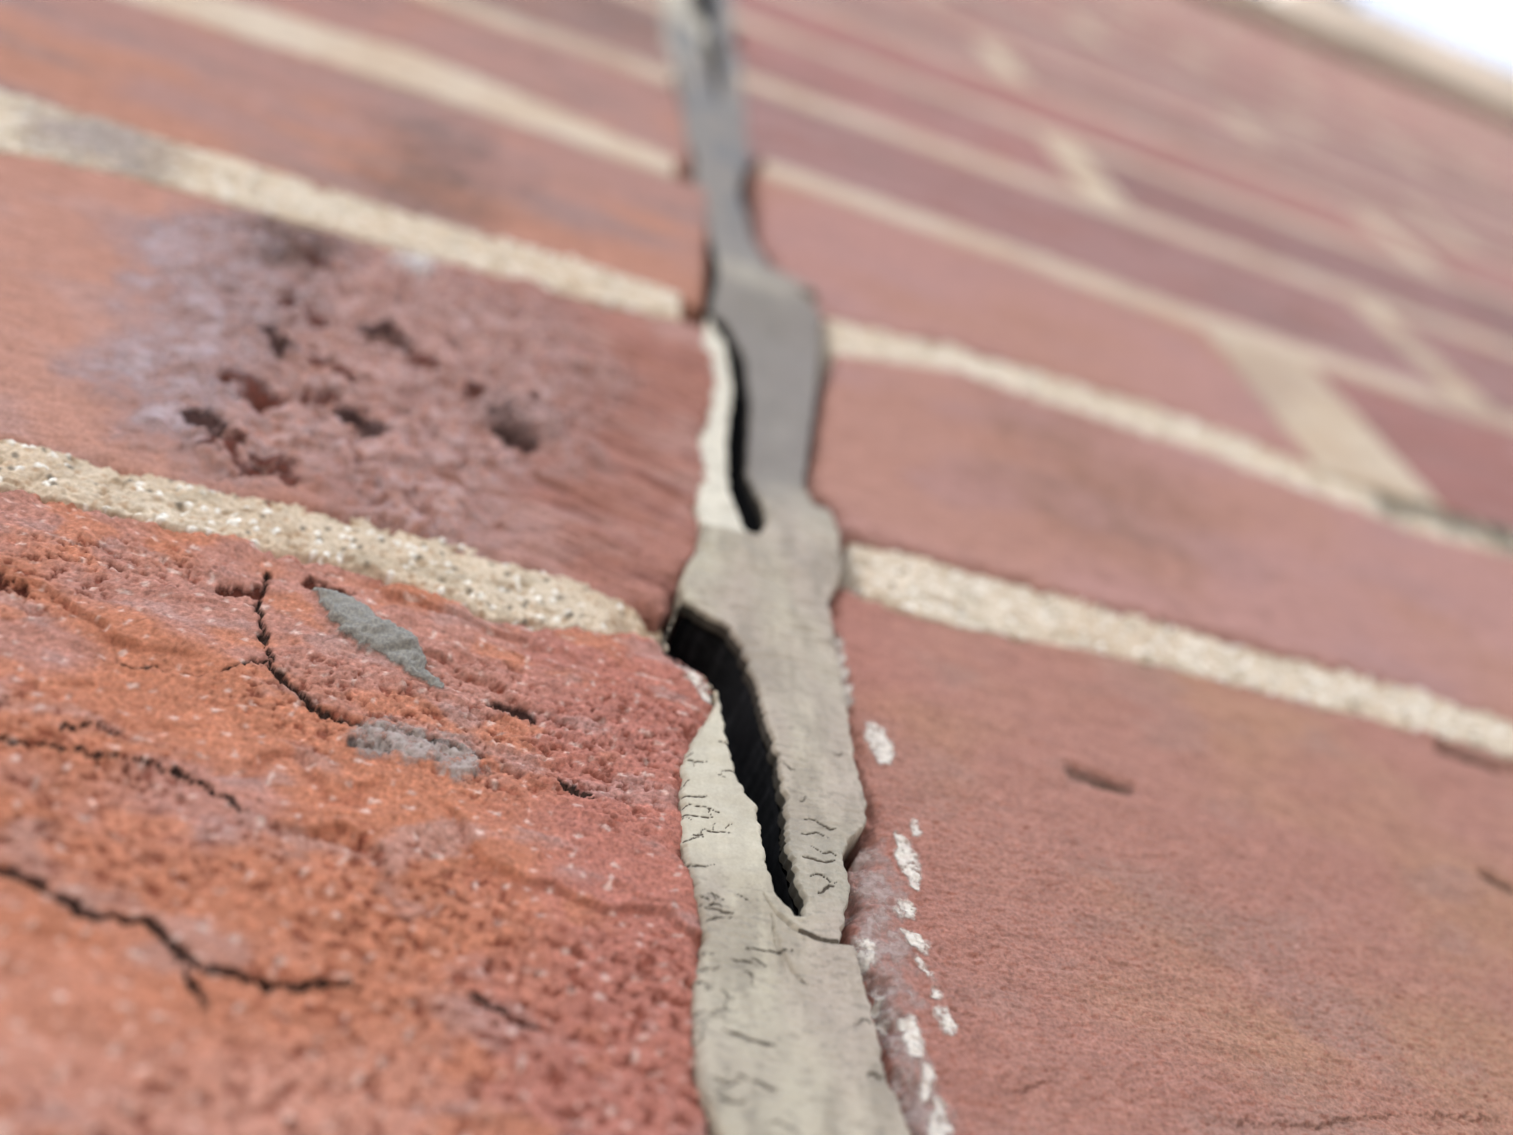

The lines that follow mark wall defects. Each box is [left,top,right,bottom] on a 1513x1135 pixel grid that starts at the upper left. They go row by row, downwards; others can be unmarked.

crack [692,0,720,100]
spalling [155,231,624,550]
crack [701,309,760,534]
crack [201,572,360,727]
crack [0,722,248,813]
crack [402,729,479,759]
crack [558,780,594,800]
crack [0,868,361,1011]
crack [469,991,542,1031]
crack [661,613,839,1131]
crack [867,1072,885,1080]
damp [844,849,933,1135]